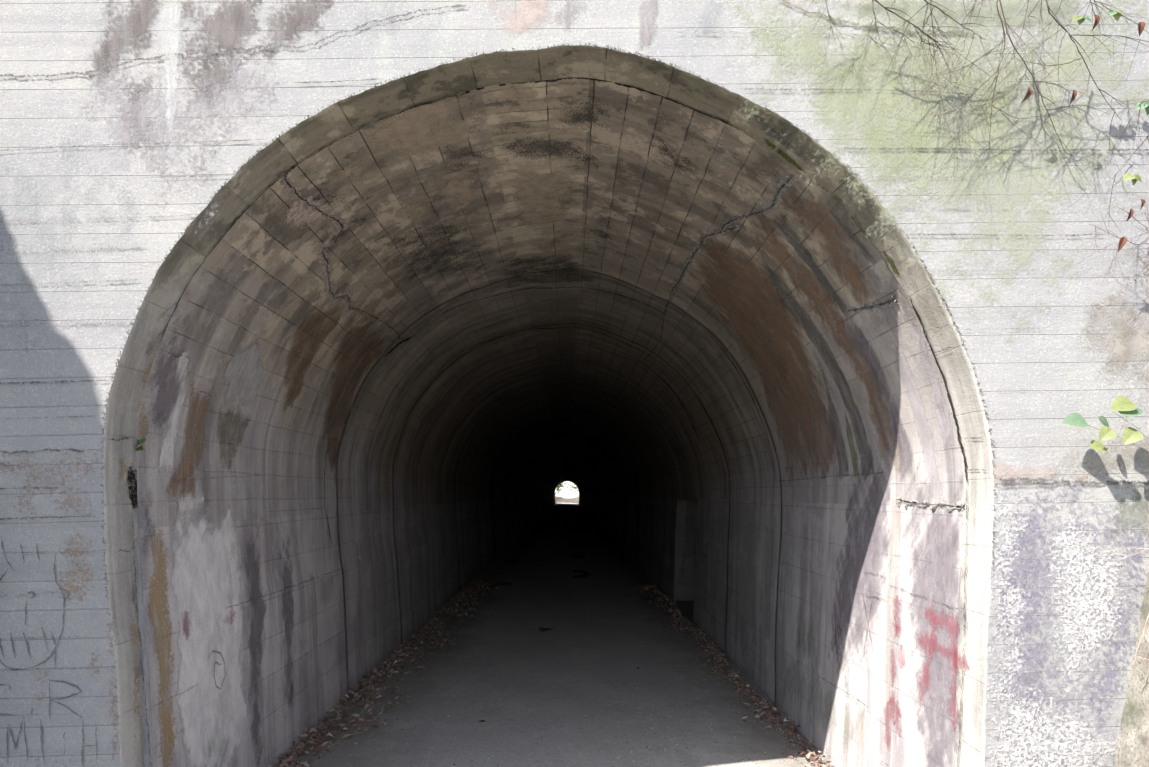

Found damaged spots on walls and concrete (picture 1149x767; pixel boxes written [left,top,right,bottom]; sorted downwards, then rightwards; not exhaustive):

crack [1,139,264,151]
damp [83,0,332,194]
crack [0,4,465,78]
damp [433,101,611,174]
damp [383,215,620,288]
rust [795,203,867,301]
rust [287,312,381,468]
crack [160,77,1149,767]
rust [762,227,891,453]
damp [767,267,965,767]
rust [148,527,179,767]